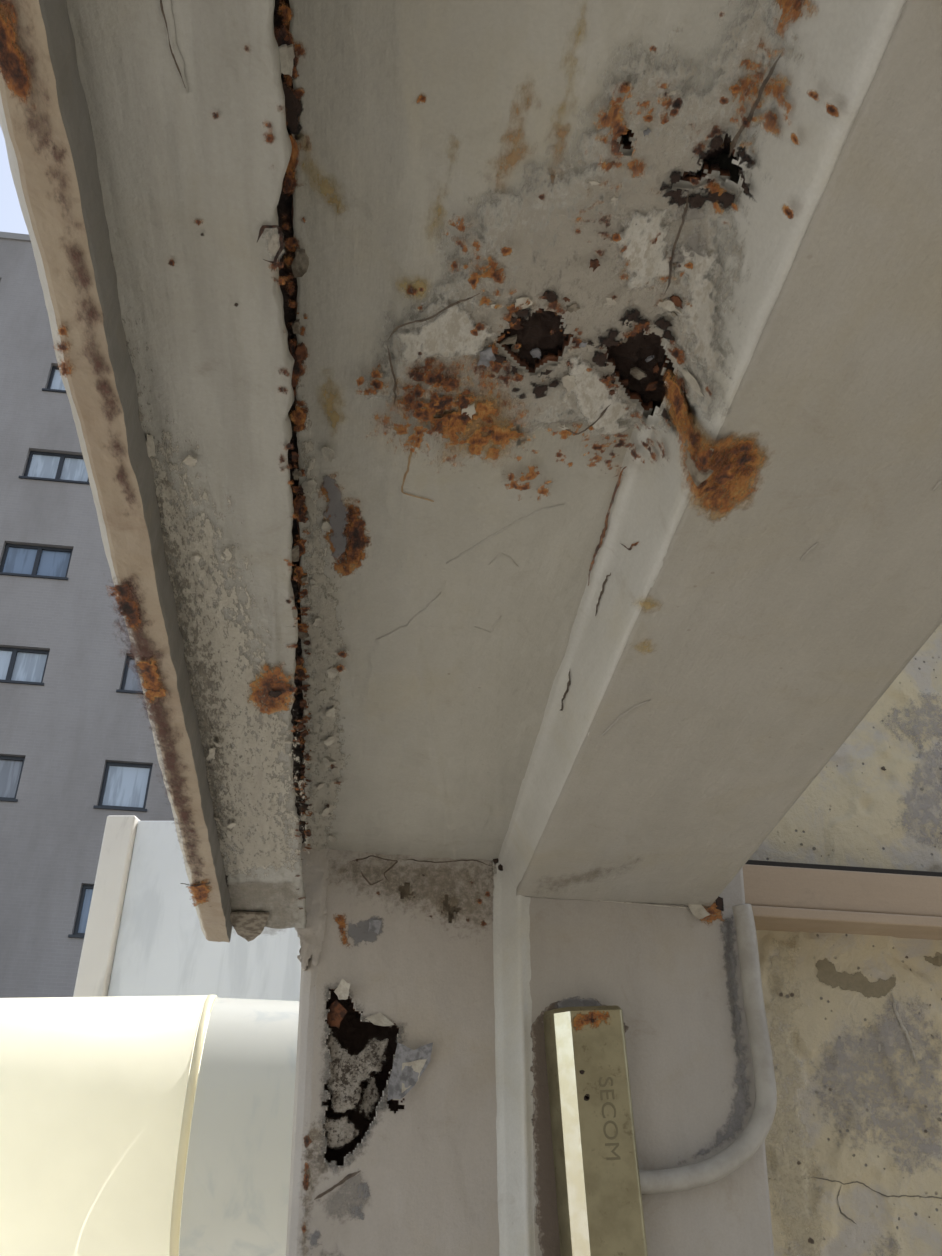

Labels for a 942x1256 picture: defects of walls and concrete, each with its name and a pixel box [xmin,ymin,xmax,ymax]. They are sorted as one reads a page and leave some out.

crack [160,0,185,86]
corrosion [274,4,340,213]
spalling [808,90,839,117]
spalling [356,0,802,502]
corrosion [664,371,766,520]
corrosion [248,216,370,855]
crack [588,466,639,616]
corrosion [107,576,212,906]
crack [560,671,571,711]
damp [816,958,896,998]
damp [924,952,942,966]
crack [768,1177,942,1224]